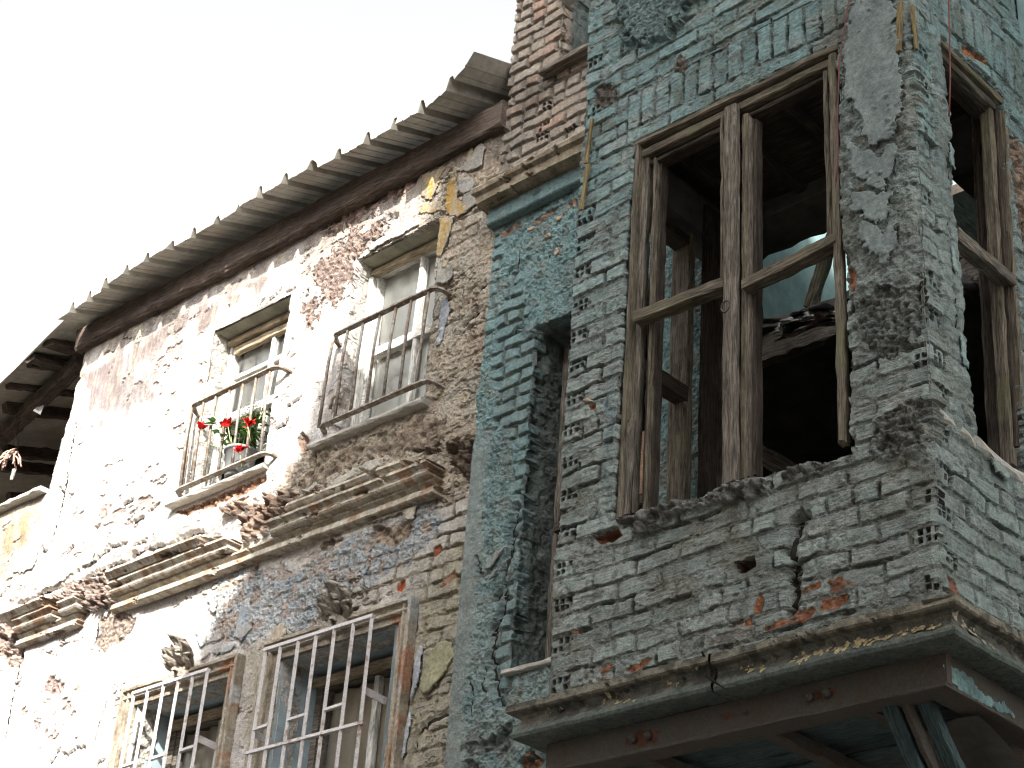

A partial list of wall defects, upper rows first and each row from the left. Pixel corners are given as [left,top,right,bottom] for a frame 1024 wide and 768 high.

flaking render [840,0,904,266]
flaking render [298,143,486,330]
flaking render [177,477,267,517]
flaking render [12,543,95,594]
flaking render [320,538,343,552]
flaking render [367,505,418,547]
crack [790,518,812,611]
flaking render [96,611,137,653]
peeling [195,602,252,656]
crack [417,508,521,748]
flaking render [745,576,855,631]